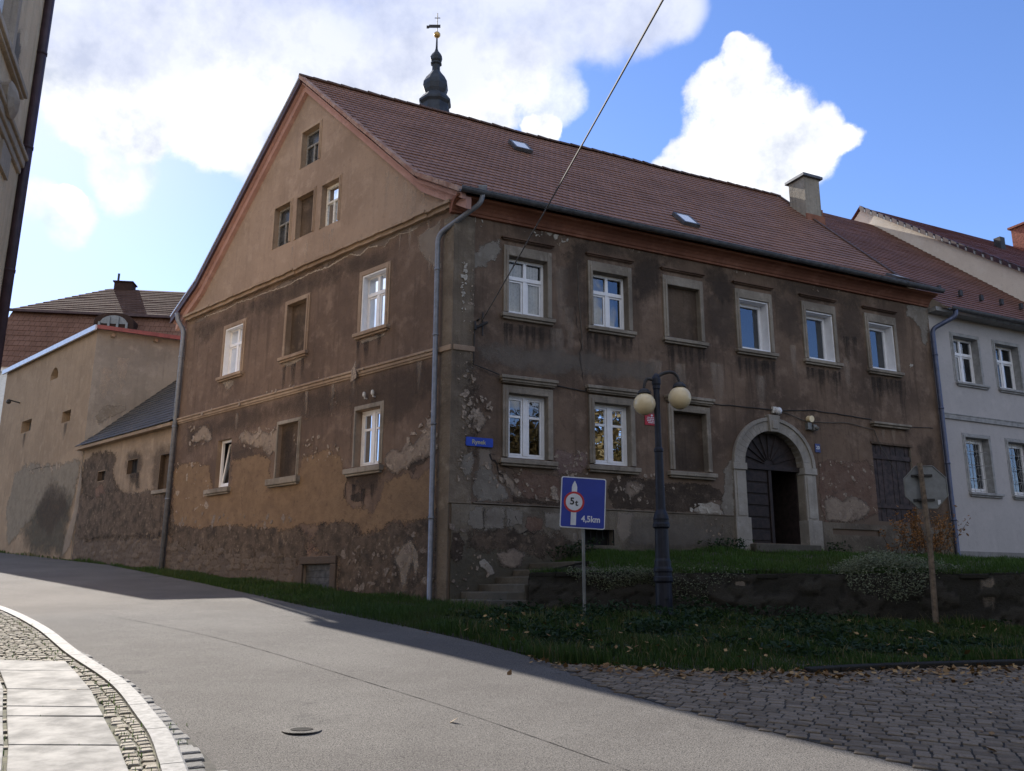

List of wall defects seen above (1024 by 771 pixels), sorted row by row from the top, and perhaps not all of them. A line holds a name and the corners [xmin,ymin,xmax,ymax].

damp [24,468,82,557]
spalling [71,352,572,599]
spalling [608,473,723,515]
peeling [818,459,878,523]